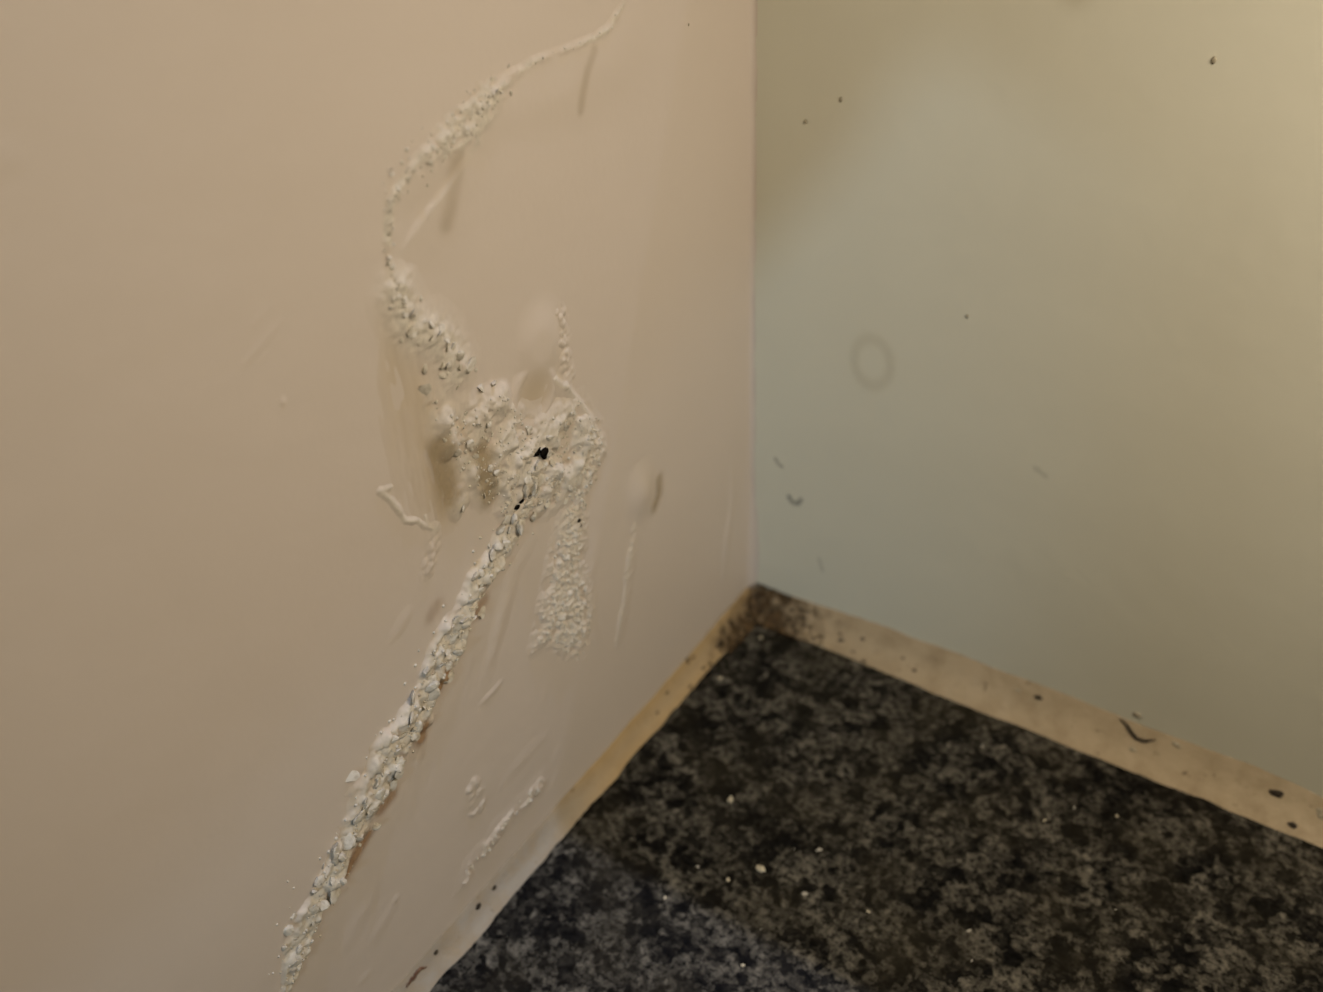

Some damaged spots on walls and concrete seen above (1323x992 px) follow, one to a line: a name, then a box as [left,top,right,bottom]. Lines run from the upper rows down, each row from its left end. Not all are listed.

water stain [268,417,608,992]
water stain [686,583,866,670]